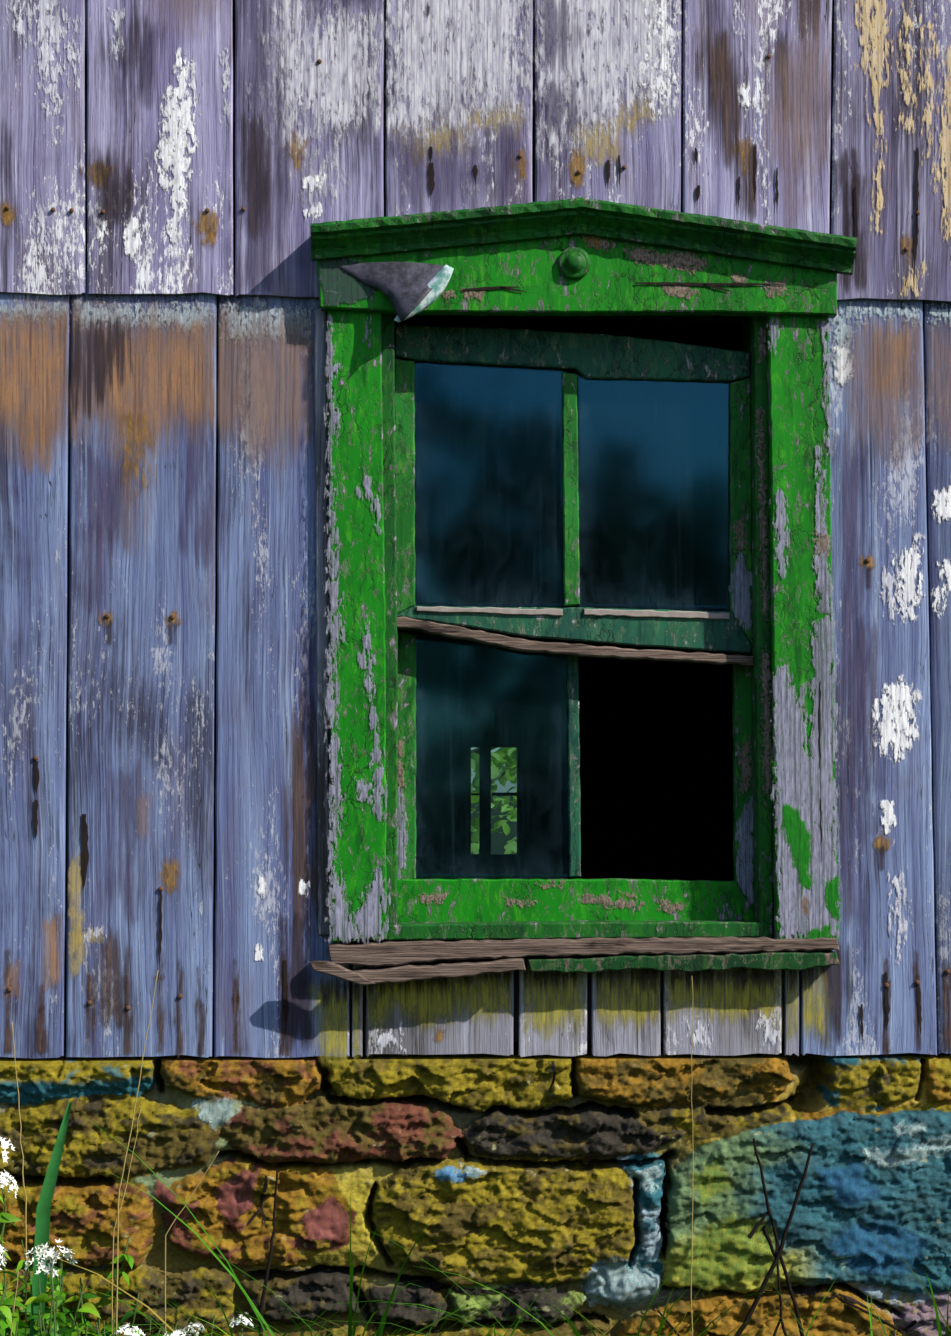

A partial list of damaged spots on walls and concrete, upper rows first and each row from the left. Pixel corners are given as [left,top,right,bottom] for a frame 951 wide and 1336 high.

peeling [6,0,83,146]
peeling [854,0,951,241]
peeling [96,213,142,263]
peeling [582,236,708,300]
rust [0,319,299,487]
rust [99,613,113,645]
rust [166,611,181,644]
peeling [0,258,485,946]
peeling [728,260,951,939]
peeling [503,879,566,908]
peeling [580,888,687,914]
peeling [254,943,264,961]